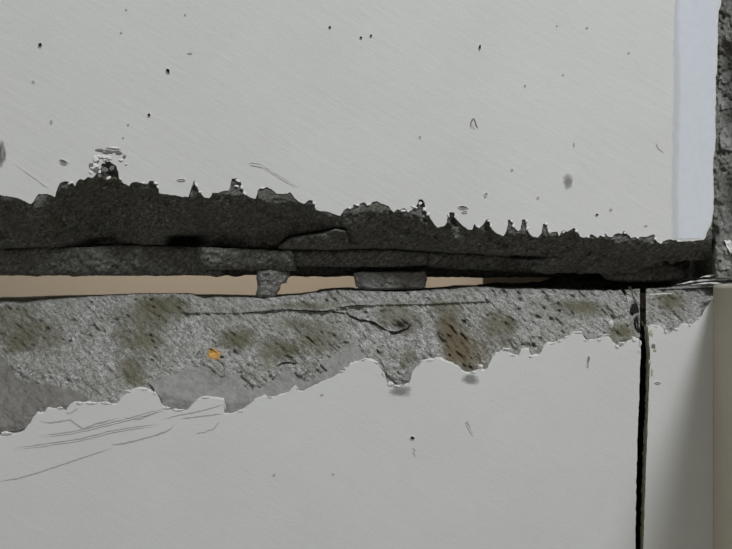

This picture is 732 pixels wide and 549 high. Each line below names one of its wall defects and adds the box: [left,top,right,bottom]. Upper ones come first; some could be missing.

spalling [0,0,732,436]
crack [250,305,411,334]
leakage [434,303,481,383]
crack [9,404,223,480]
crack [606,286,657,549]